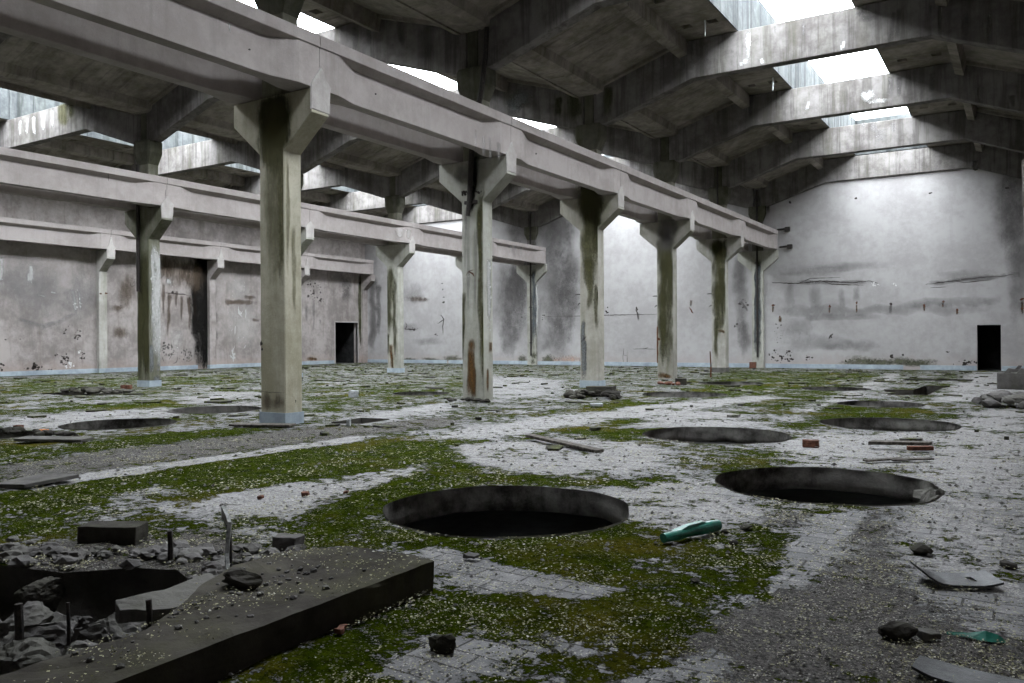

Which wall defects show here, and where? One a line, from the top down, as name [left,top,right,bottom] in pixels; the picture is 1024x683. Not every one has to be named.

leakage [160,257,211,369]
leakage [503,270,537,339]
leakage [549,197,599,340]
leakage [658,252,673,356]
leakage [713,263,761,354]
corrosion [467,341,489,394]